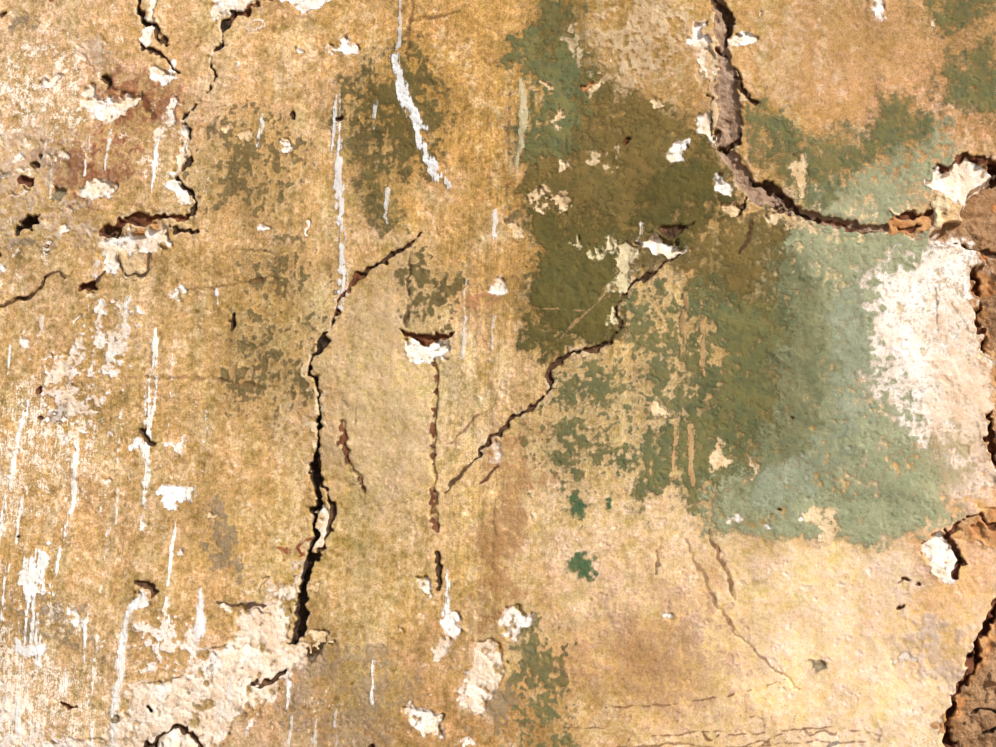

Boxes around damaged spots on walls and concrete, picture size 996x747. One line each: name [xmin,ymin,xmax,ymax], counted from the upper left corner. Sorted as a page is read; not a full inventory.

spalling [37,178,172,280]
crack [95,0,237,245]
damp [331,95,348,310]
damp [389,0,452,189]
peeling [498,0,996,584]
crack [705,0,889,254]
damp [0,296,197,666]
crack [280,232,421,653]
crack [428,250,690,591]
damp [110,524,214,747]
spalling [50,560,335,747]
peeling [456,606,579,747]